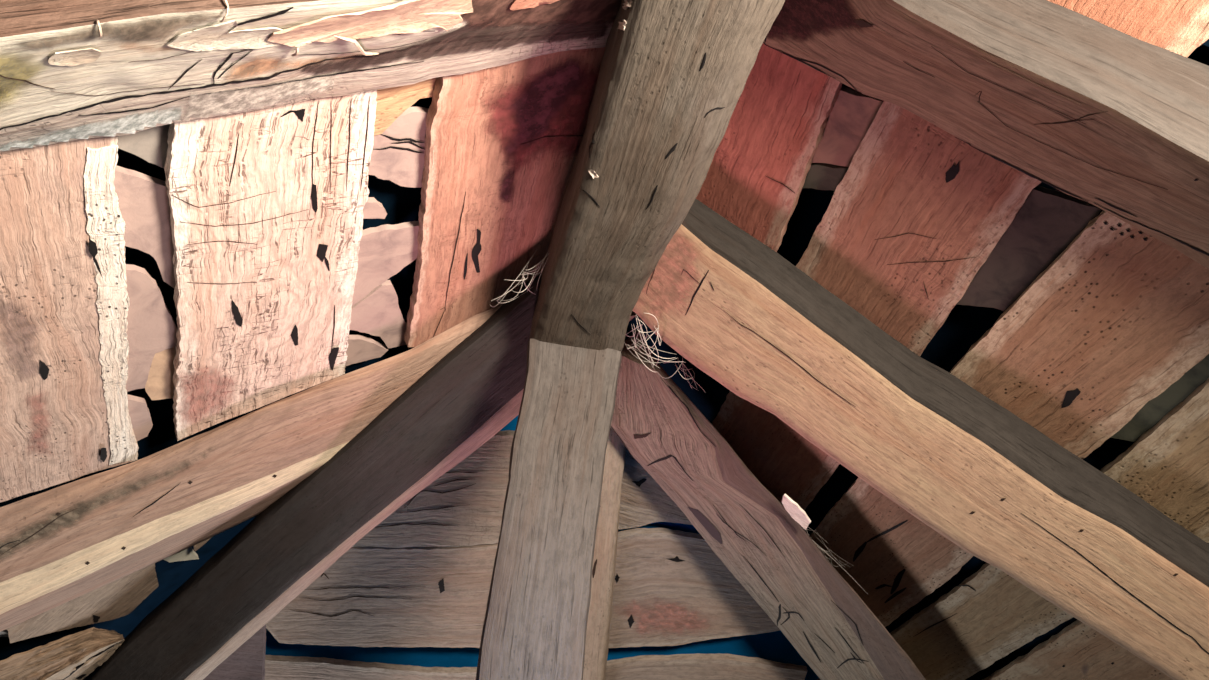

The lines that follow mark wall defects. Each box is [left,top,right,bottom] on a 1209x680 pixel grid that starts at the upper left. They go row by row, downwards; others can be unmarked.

crack [0,7,427,245]
leakage [0,0,622,151]
leakage [491,60,599,202]